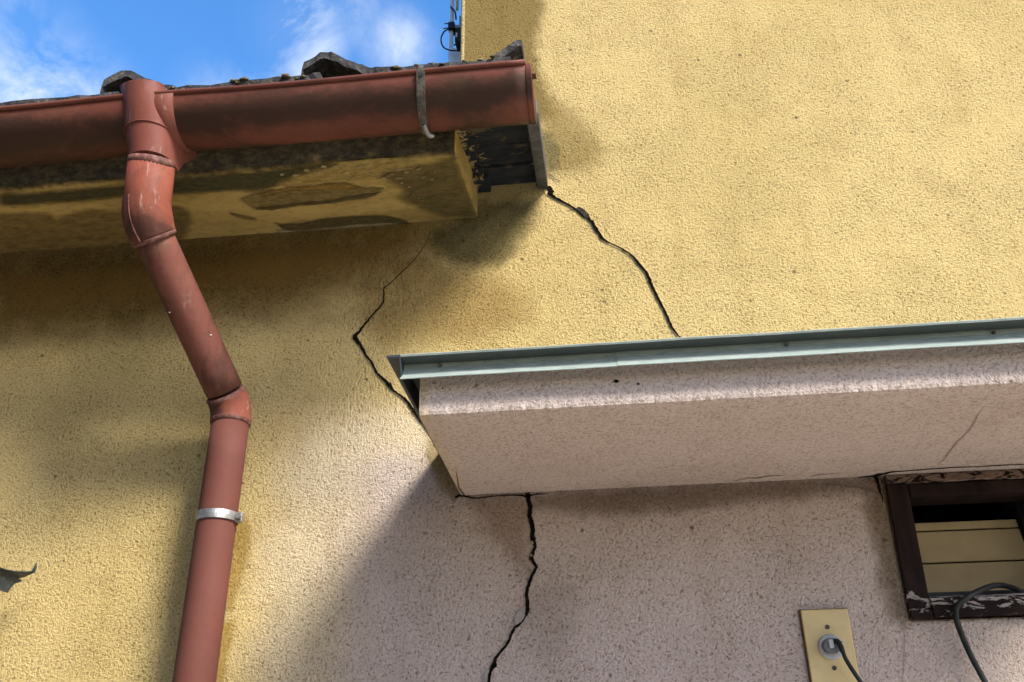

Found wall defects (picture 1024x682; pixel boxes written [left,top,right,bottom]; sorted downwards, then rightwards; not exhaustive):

water stain [0,210,130,254]
water stain [172,207,190,240]
crack [352,231,431,429]
crack [536,174,680,338]
crack [455,473,549,682]